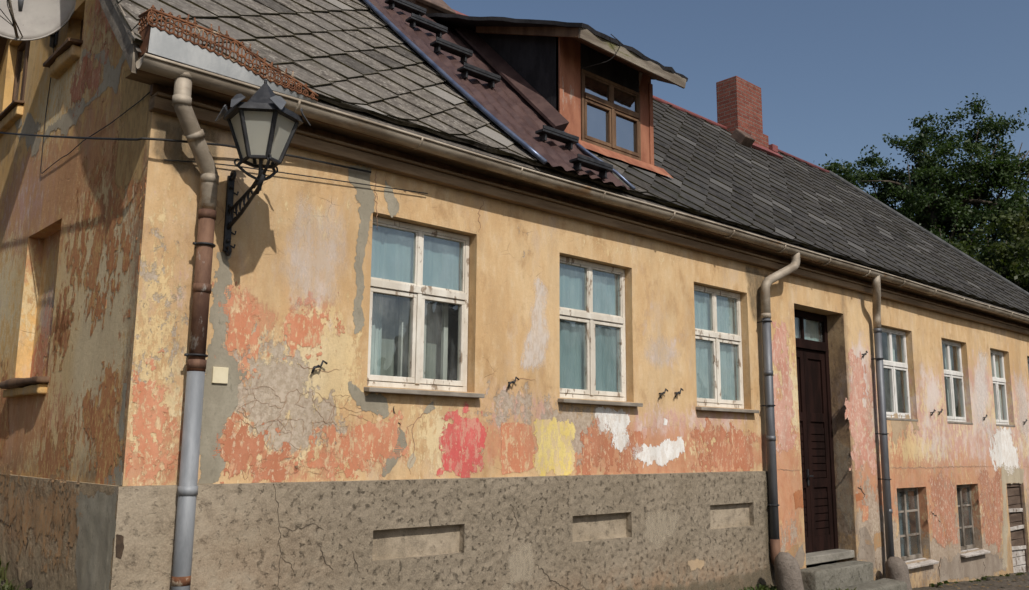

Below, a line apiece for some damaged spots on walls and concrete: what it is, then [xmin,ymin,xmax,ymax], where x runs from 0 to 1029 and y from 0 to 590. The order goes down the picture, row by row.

peeling [30,130,147,378]
corrosion [187,208,217,372]
peeling [211,281,268,380]
peeling [273,291,345,361]
peeling [37,347,180,486]
peeling [212,408,409,484]
crack [228,365,423,590]
peeling [576,418,647,475]
peeling [690,417,758,472]
peeling [844,349,877,476]